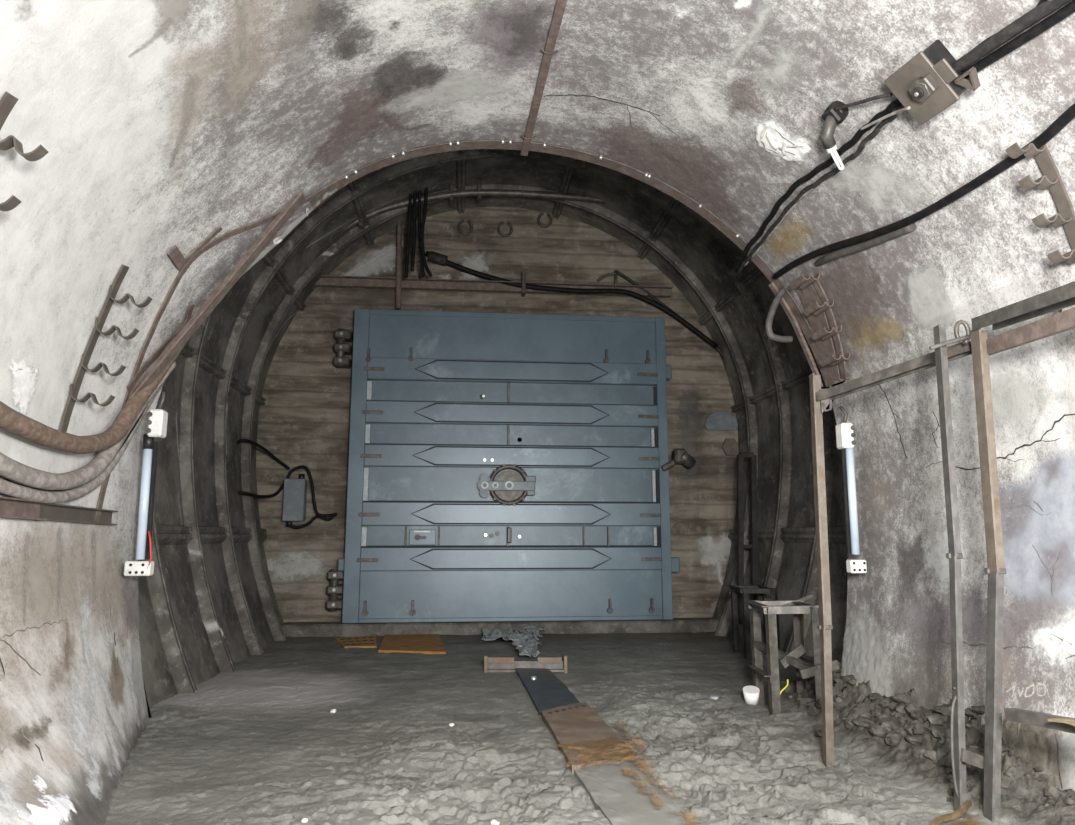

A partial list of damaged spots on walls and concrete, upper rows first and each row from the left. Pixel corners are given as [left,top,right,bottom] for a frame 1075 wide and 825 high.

leakage [133,0,190,54]
leakage [279,0,373,70]
leakage [308,4,548,168]
peeling [9,359,39,415]
crack [879,385,1075,474]
crack [0,619,67,675]